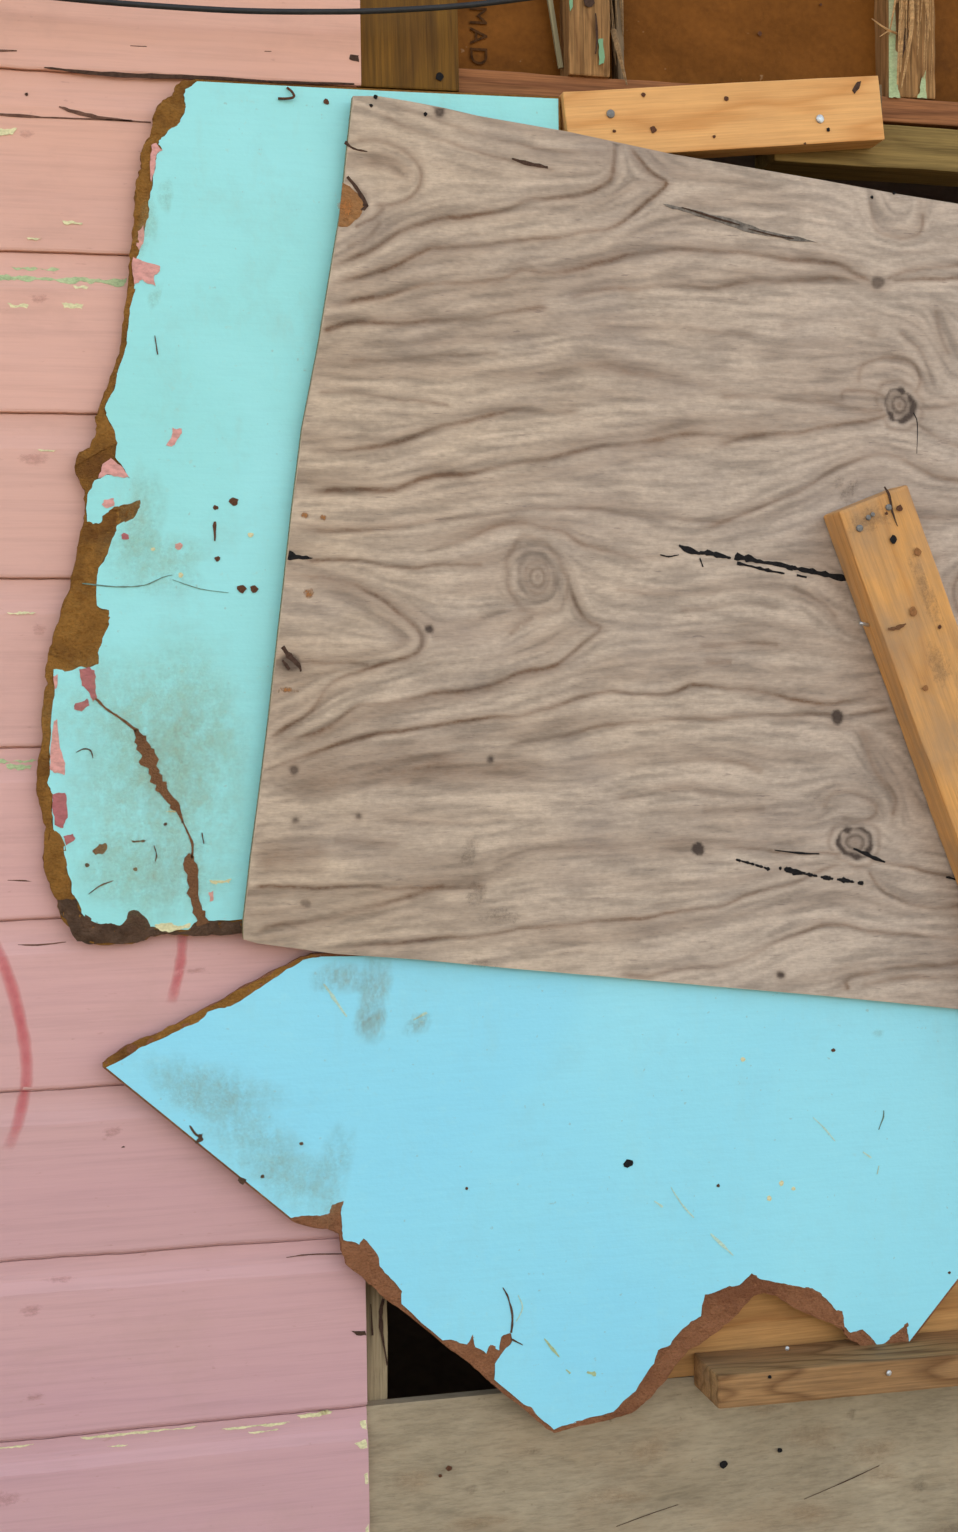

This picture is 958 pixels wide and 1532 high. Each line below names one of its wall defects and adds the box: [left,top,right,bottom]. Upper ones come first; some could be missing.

spalling [0,79,196,478]
spalling [0,496,242,945]
crack [95,698,210,926]
spalling [291,1201,402,1307]
peeling [354,1420,367,1449]
spalling [442,1333,512,1386]
spalling [524,1273,909,1433]